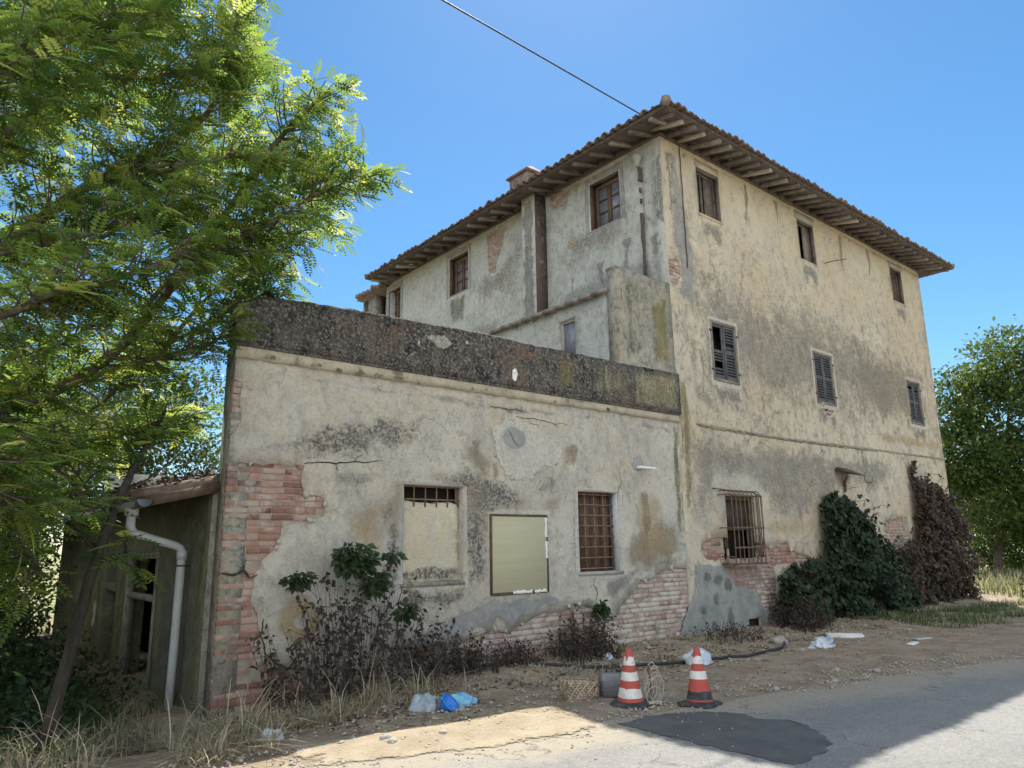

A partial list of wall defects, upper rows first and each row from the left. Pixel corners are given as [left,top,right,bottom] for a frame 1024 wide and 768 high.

spalling [487,226,505,273]
crack [491,406,567,446]
crack [304,454,383,470]
spalling [700,538,725,561]
spalling [755,543,809,569]
spalling [208,460,327,720]
spalling [369,566,689,679]